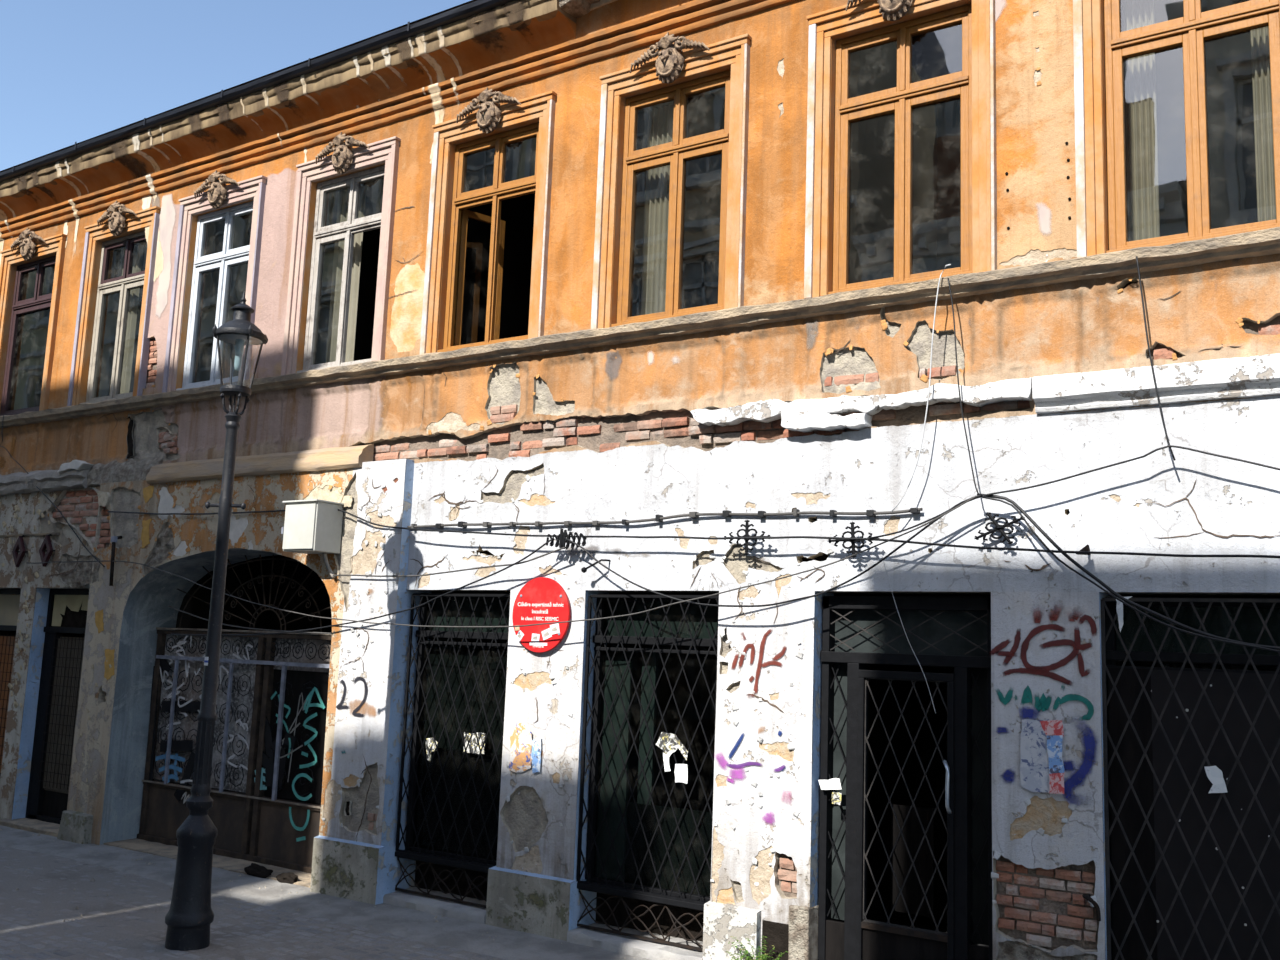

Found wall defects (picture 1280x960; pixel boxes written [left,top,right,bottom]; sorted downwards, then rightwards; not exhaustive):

flaking render [0,408,221,708]
flaking render [294,472,398,681]
crack [429,465,498,511]
peeling [463,526,530,577]
flaking render [348,362,1030,506]
flaking render [675,528,834,726]
flaking render [820,345,881,396]
flaking render [880,307,965,383]
crack [1144,478,1280,538]
flaking render [1235,313,1280,335]
peeling [710,822,797,960]
flaking render [991,796,1100,960]